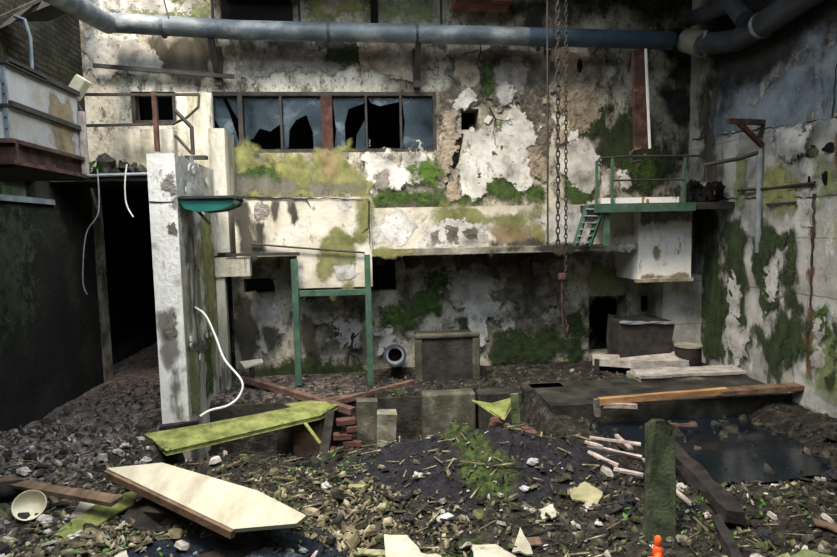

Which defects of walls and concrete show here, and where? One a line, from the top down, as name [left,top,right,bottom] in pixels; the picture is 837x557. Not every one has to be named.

rust [49,93,75,160]
flaking render [356,42,632,245]
peeling [697,26,837,145]
flaking render [800,139,835,227]
flaking render [371,207,569,347]
spalling [604,242,635,253]
flaking render [724,269,750,367]
flaking render [762,256,781,314]
flaking render [810,316,826,372]